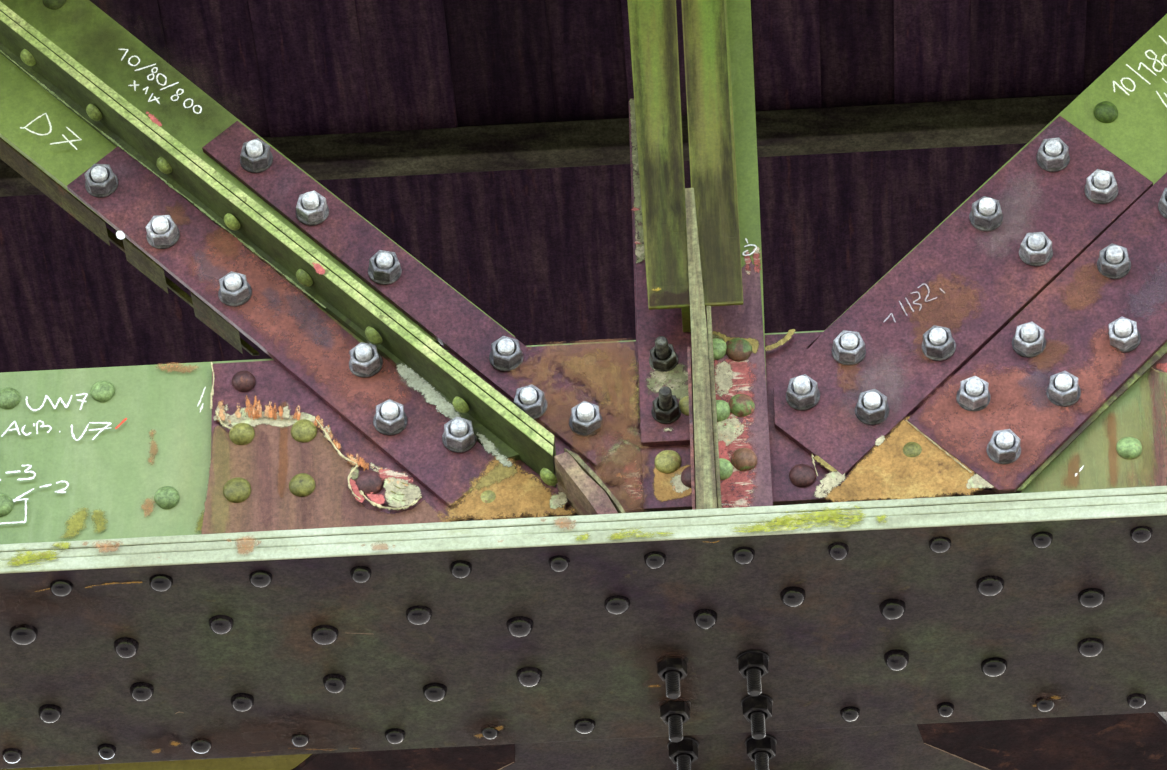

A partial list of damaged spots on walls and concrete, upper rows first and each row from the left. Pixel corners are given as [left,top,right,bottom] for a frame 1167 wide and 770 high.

peeling [210,362,422,510]
rust [512,338,648,512]
peeling [709,329,795,508]
rust [1126,353,1167,488]